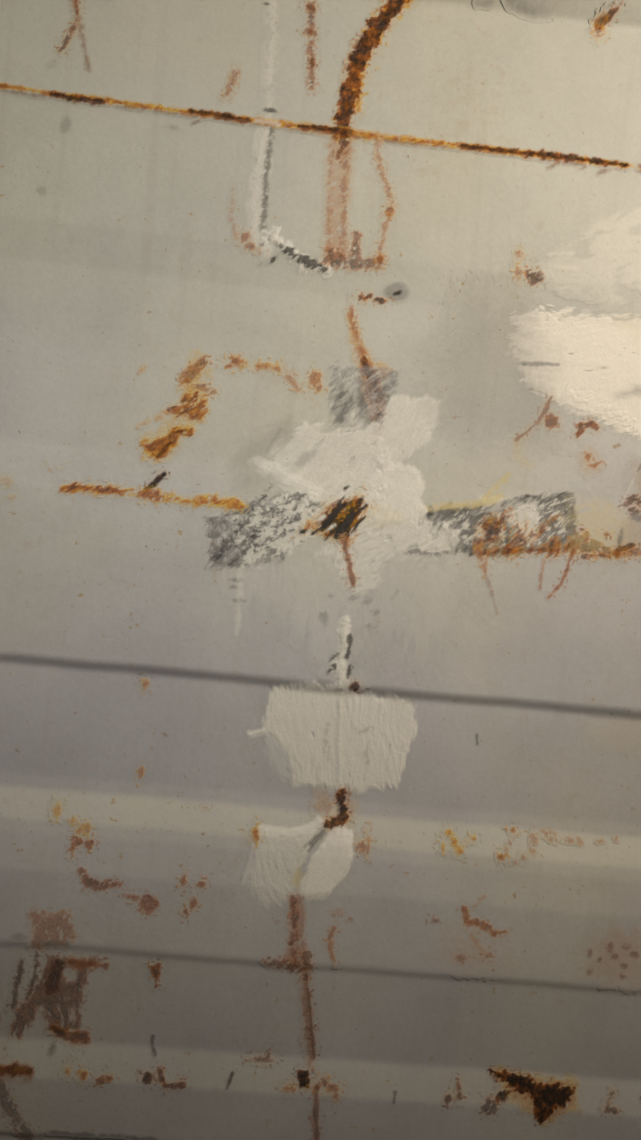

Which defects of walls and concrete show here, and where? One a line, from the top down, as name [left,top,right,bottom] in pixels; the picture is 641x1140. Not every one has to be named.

rust [585,0,627,47]
rust [296,0,421,276]
rust [39,346,330,516]
rust [470,416,641,615]
rust [308,780,378,866]
rust [0,1069,43,1140]
rust [3,793,213,1097]
rust [240,890,355,1140]
rust [440,1061,583,1131]